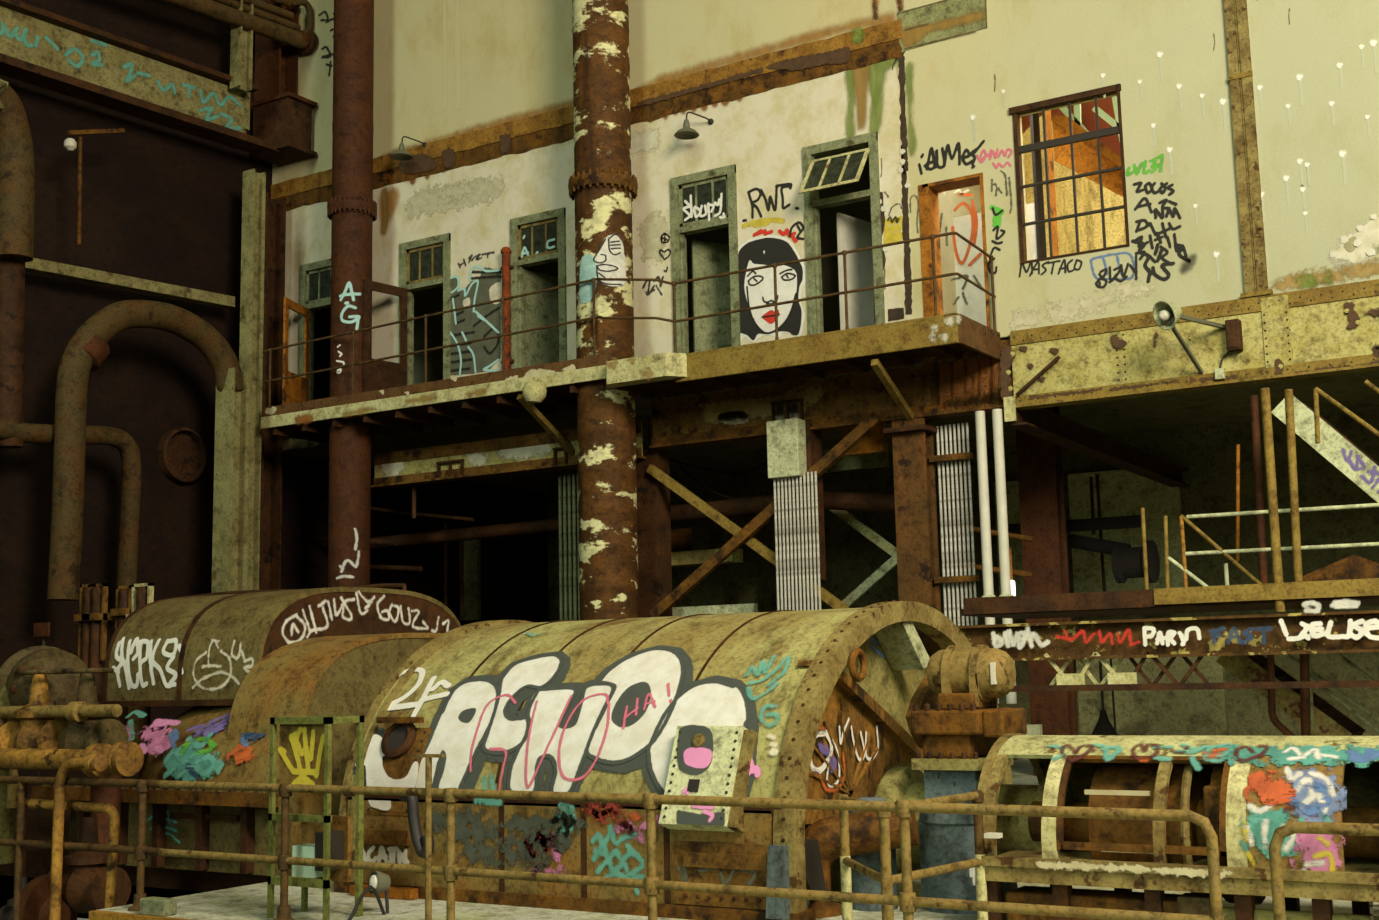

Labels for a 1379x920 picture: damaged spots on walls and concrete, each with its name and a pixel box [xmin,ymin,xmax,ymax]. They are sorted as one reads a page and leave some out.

rust [638,0,903,122]
water stain [846,12,983,137]
peeling [404,173,505,220]
rust [399,102,573,184]